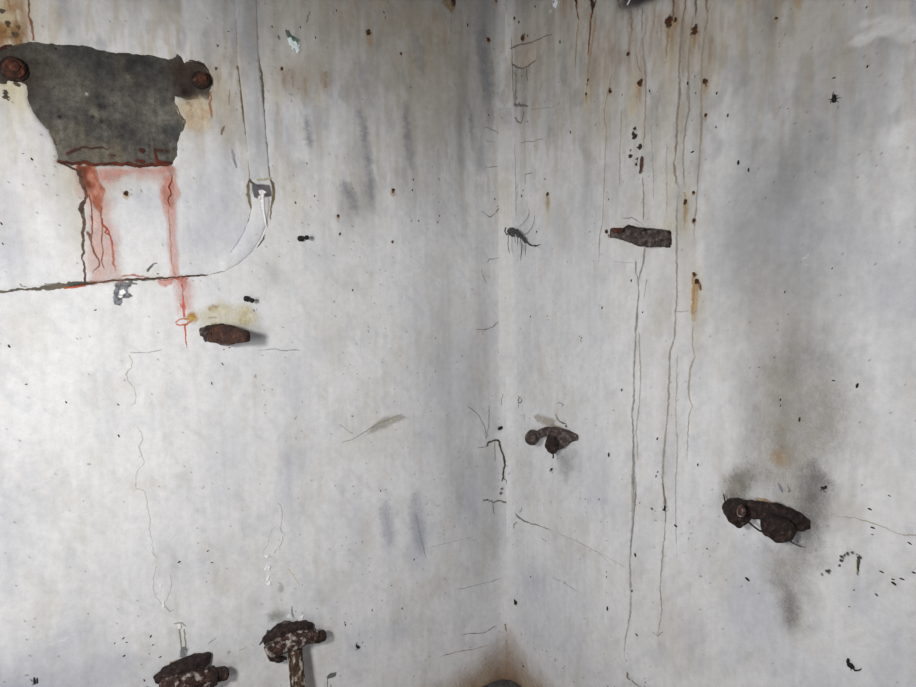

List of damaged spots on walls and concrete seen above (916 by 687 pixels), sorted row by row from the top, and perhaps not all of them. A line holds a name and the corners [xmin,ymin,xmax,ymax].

peeling [0,9,218,171]
rust [77,166,128,283]
crack [0,271,225,293]
rust [139,165,257,346]
rust [604,225,672,248]